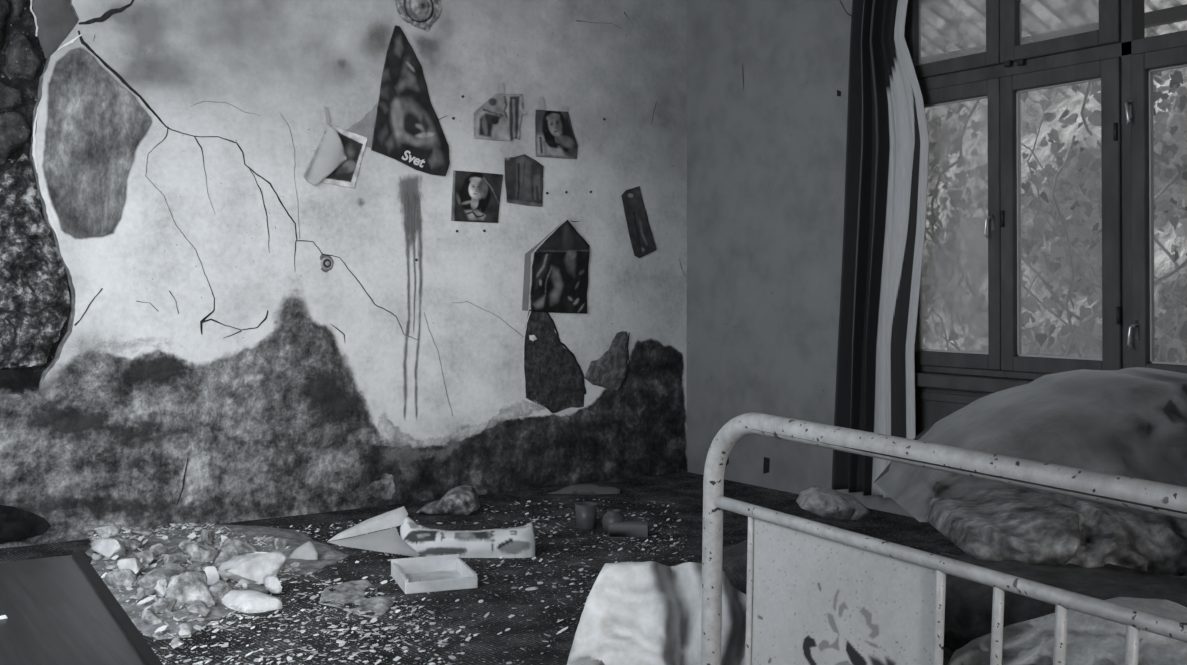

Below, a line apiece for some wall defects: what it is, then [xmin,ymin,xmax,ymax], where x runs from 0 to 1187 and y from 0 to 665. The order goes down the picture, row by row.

flaking render [0,0,152,394]
crack [74,0,453,416]
leakage [400,177,422,417]
flaking render [379,310,630,448]